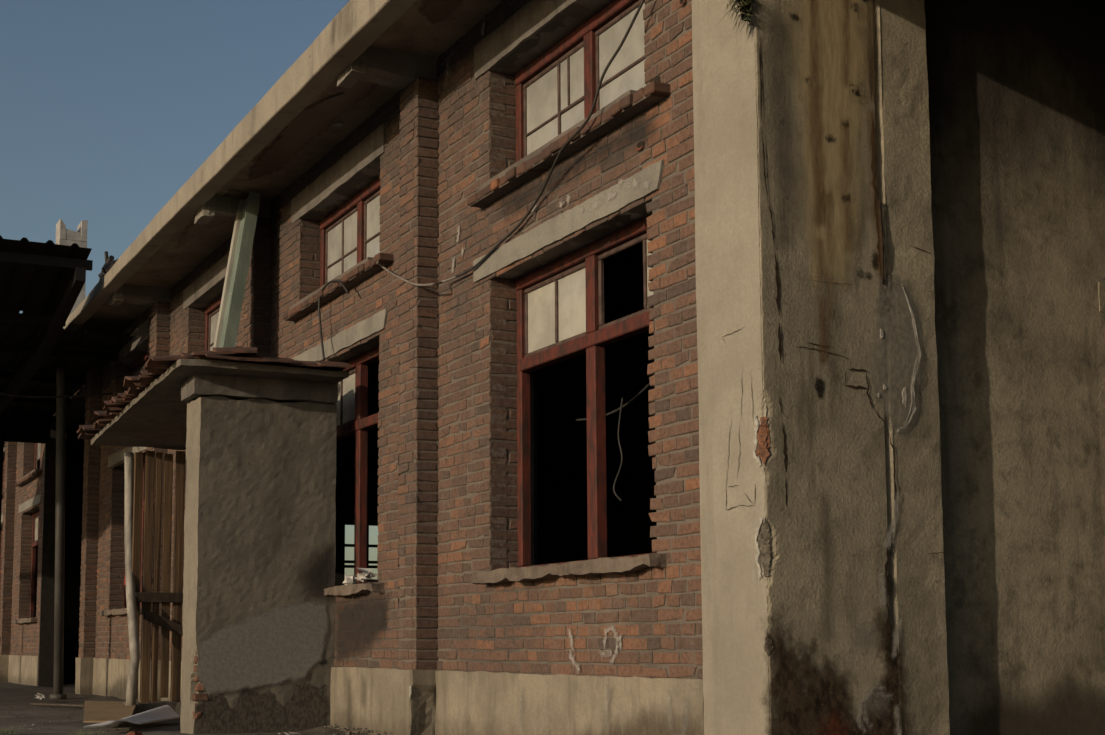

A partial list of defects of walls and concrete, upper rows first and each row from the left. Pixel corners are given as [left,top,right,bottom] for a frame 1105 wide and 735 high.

crack [759,0,901,666]
spalling [752,416,770,467]
spalling [755,517,772,580]
spalling [192,650,327,734]
damp [764,613,909,735]